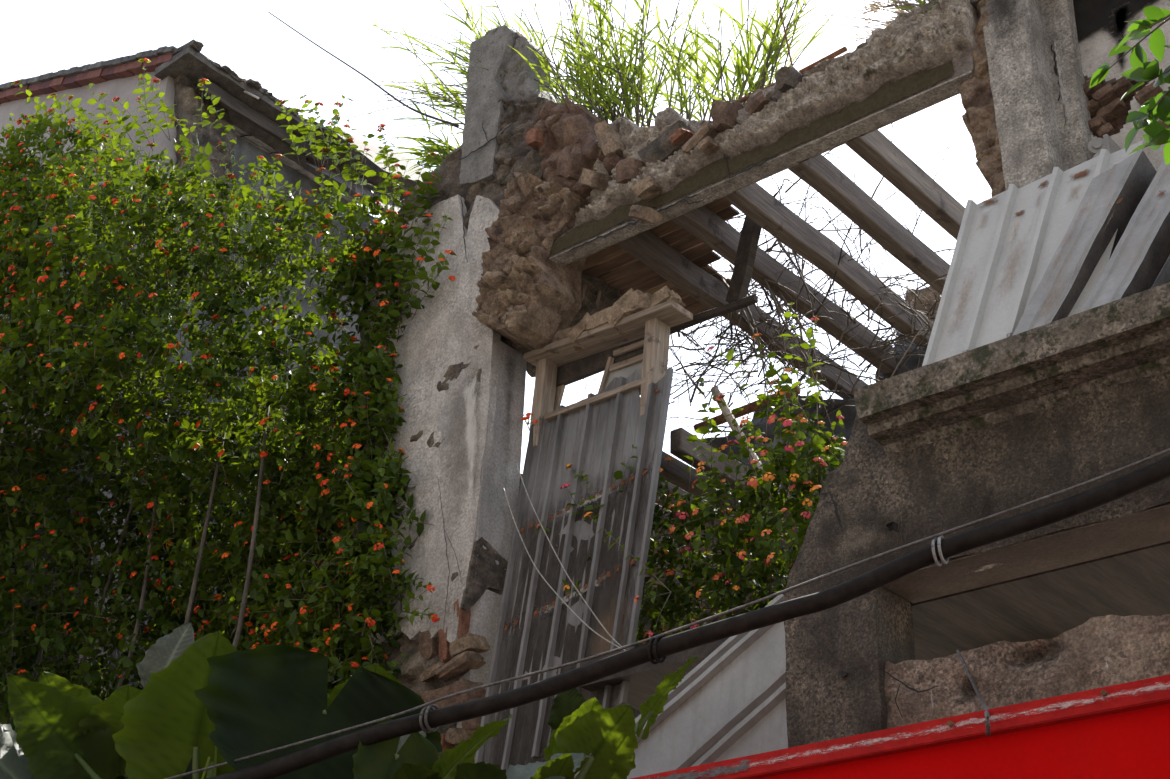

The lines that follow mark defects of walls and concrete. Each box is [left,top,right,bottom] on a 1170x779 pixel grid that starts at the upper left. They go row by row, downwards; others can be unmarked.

crack [1051,45,1066,126]
flaking render [1083,76,1149,138]
flaking render [419,537,508,711]
flaking render [439,717,482,753]
peeling [648,681,1170,779]